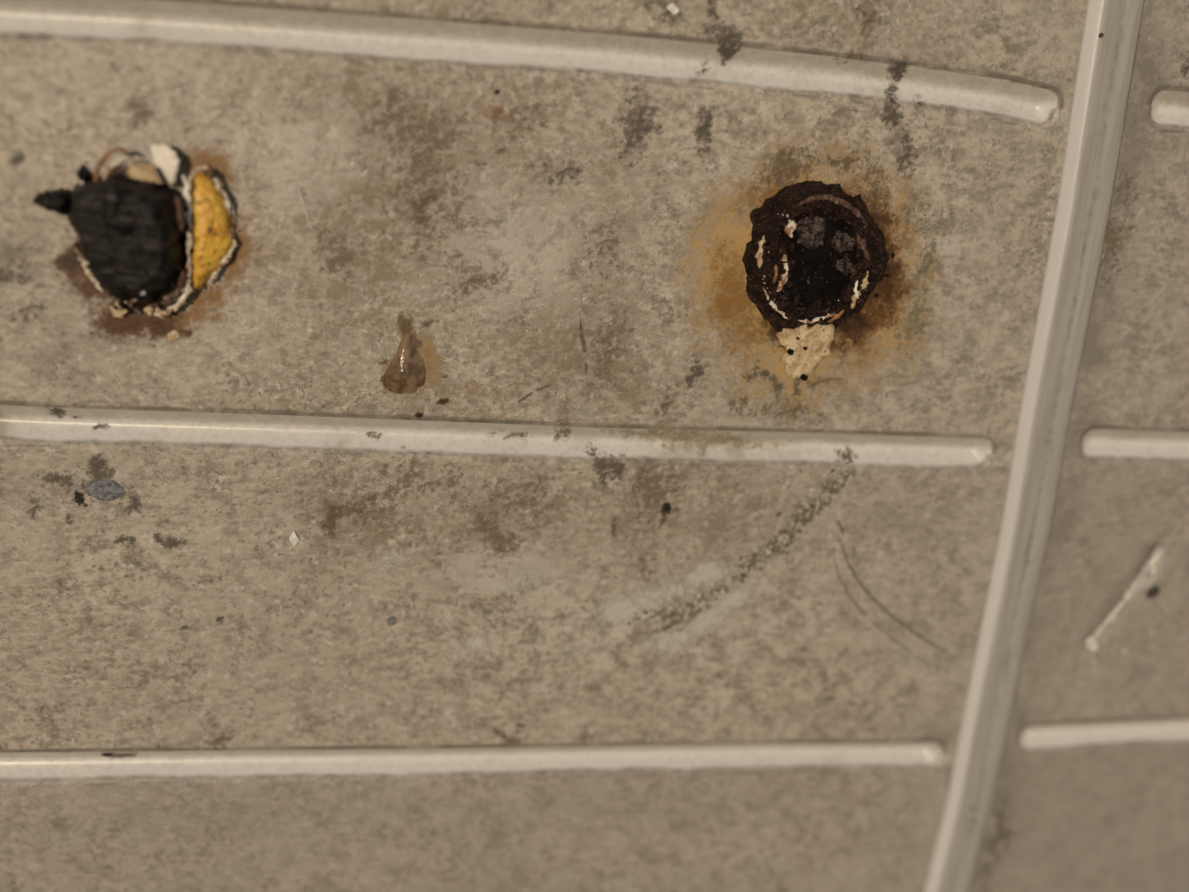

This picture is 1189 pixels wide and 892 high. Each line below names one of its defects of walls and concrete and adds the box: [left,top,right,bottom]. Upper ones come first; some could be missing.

rust [176,149,235,186]
rust [54,216,260,341]
rust [678,142,934,417]
crack [833,520,955,664]